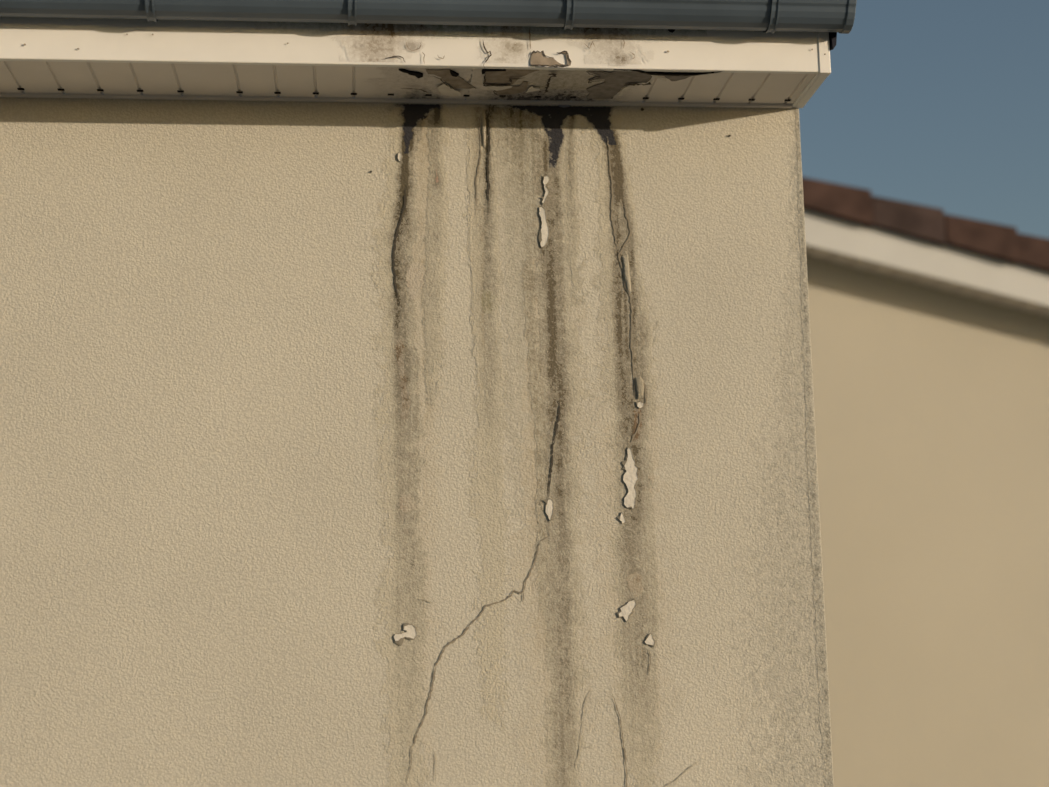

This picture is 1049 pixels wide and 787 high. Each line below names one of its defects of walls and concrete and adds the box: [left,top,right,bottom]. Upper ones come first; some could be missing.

peeling [426,51,571,97]
peeling [586,70,720,100]
flaking render [539,175,550,248]
water stain [364,67,665,787]
crack [548,398,560,496]
flaking render [617,447,639,524]
flaking render [394,623,417,646]
crack [405,522,550,785]
flaking render [617,599,638,623]
crack [610,691,628,787]